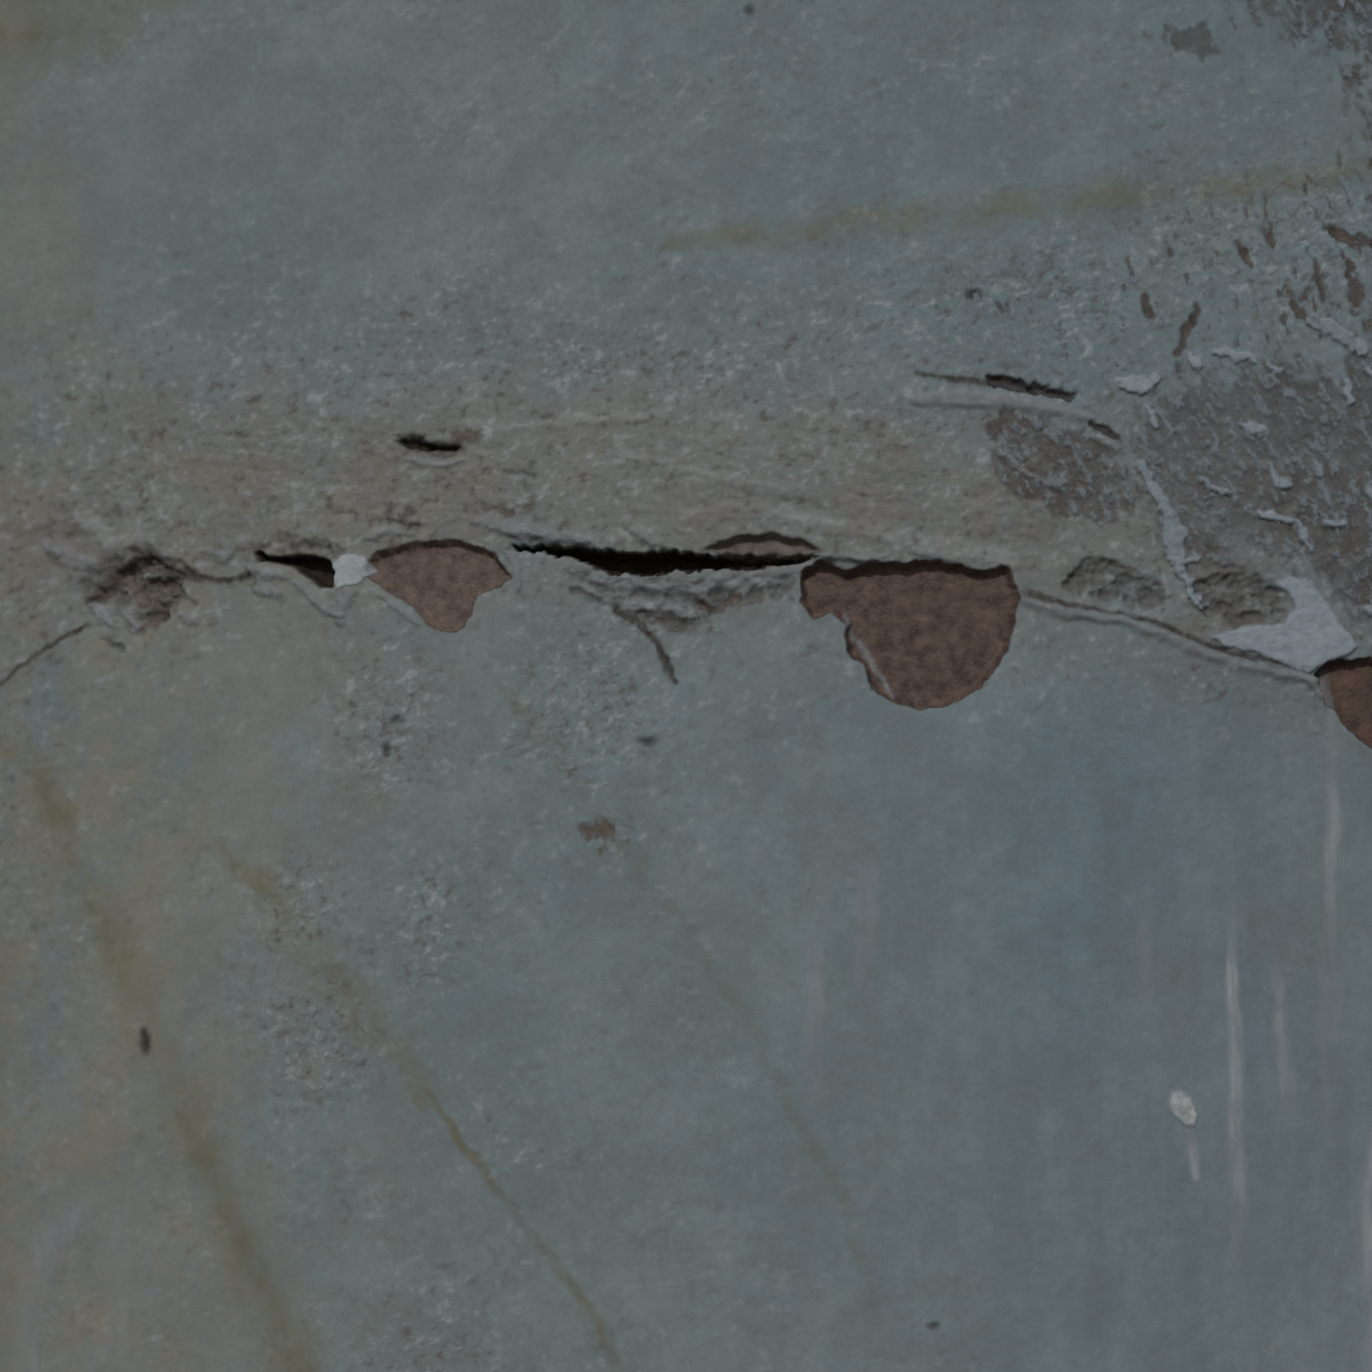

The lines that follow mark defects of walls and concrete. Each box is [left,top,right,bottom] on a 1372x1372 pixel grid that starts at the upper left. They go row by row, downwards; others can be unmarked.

peeling [987,159,1372,615]
crack [0,542,351,685]
spalling [332,539,519,632]
crack [489,519,819,683]
spalling [800,552,1020,710]
crack [1028,593,1313,673]
peeling [1213,576,1372,748]